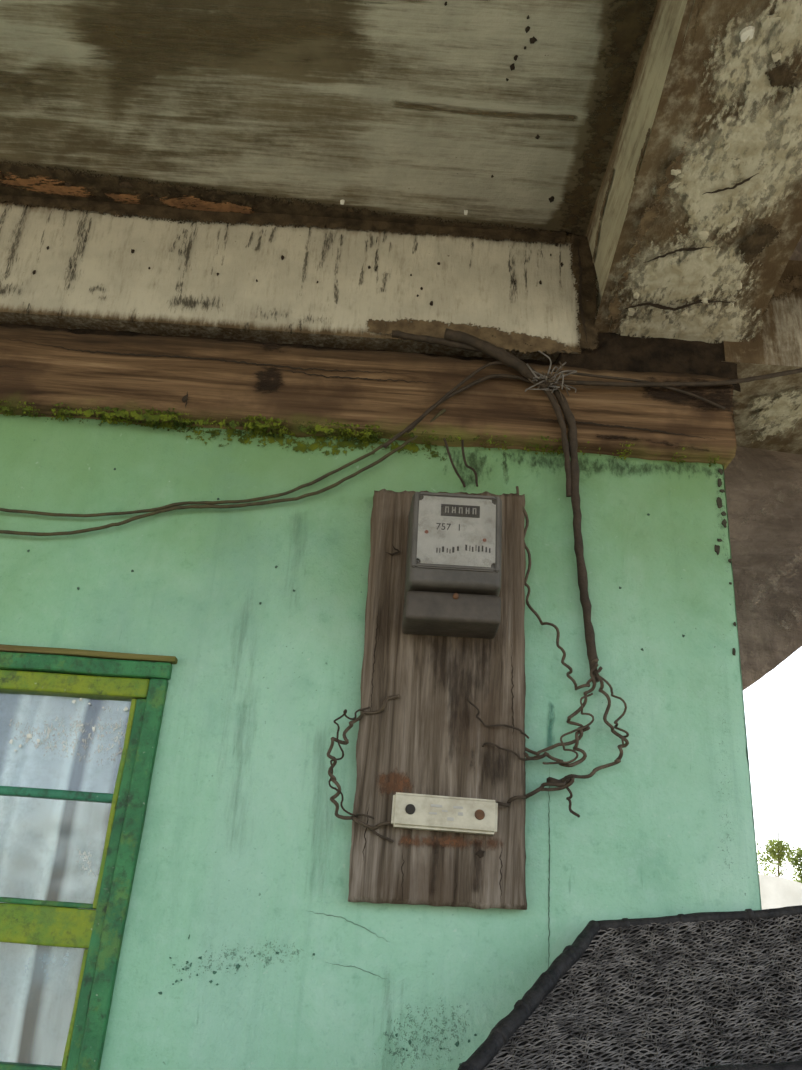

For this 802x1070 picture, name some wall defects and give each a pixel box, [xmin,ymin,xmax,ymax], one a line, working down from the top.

damp [80,3,353,89]
spalling [506,15,537,81]
damp [395,102,577,121]
peeling [549,0,655,263]
spalling [0,161,547,232]
crack [702,173,759,195]
damp [0,205,31,314]
damp [65,208,91,289]
damp [169,224,223,310]
damp [359,230,391,292]
crack [569,234,734,351]